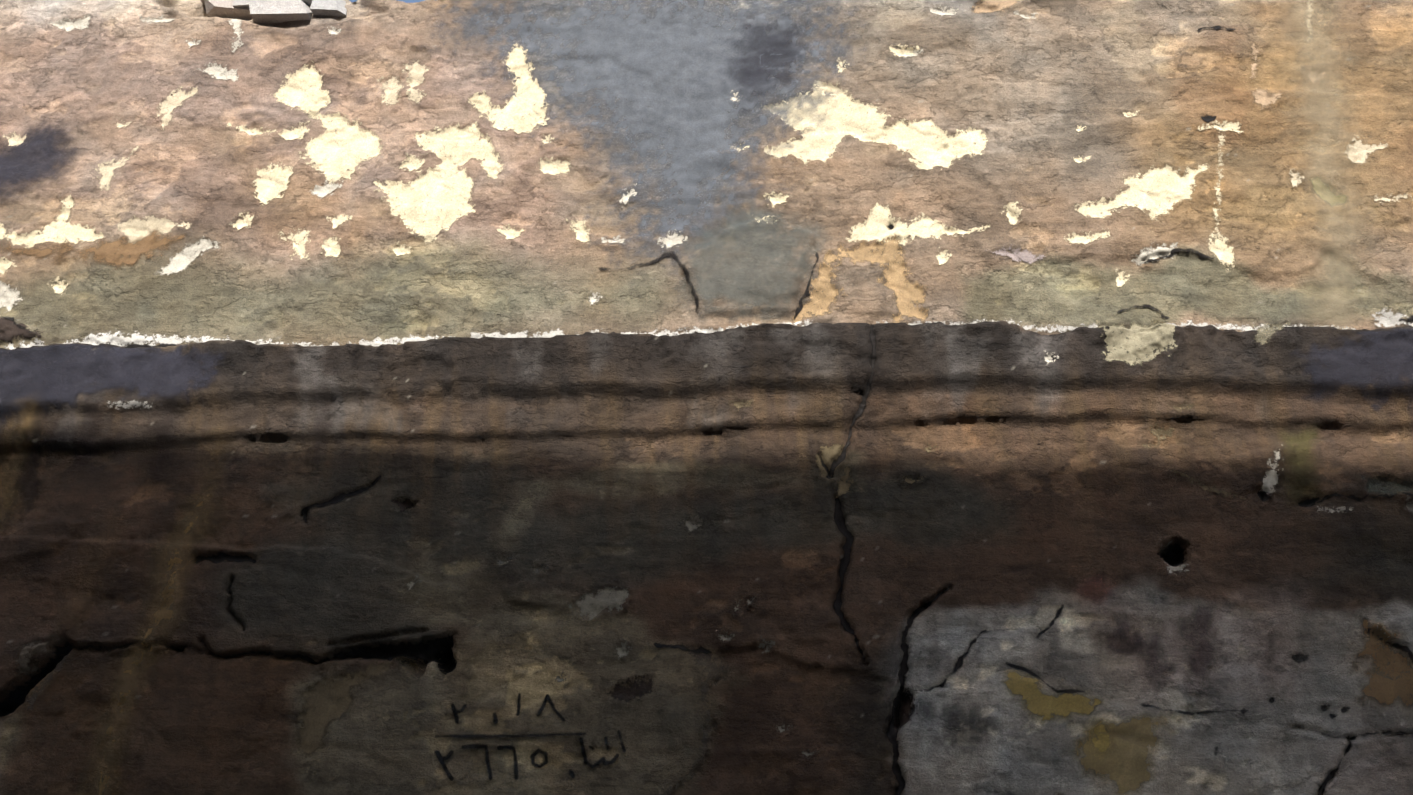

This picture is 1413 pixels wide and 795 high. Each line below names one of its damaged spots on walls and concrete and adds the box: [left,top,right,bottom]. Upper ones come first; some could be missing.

leakage [0,126,76,194]
peeling [0,195,221,345]
peeling [226,61,382,230]
peeling [373,43,571,256]
crack [599,251,698,312]
peeling [730,57,988,171]
flaking render [697,201,1022,333]
peeling [1064,163,1210,244]
crack [818,324,876,659]
crack [71,630,457,678]
crack [886,586,1064,795]
crack [1312,730,1413,795]